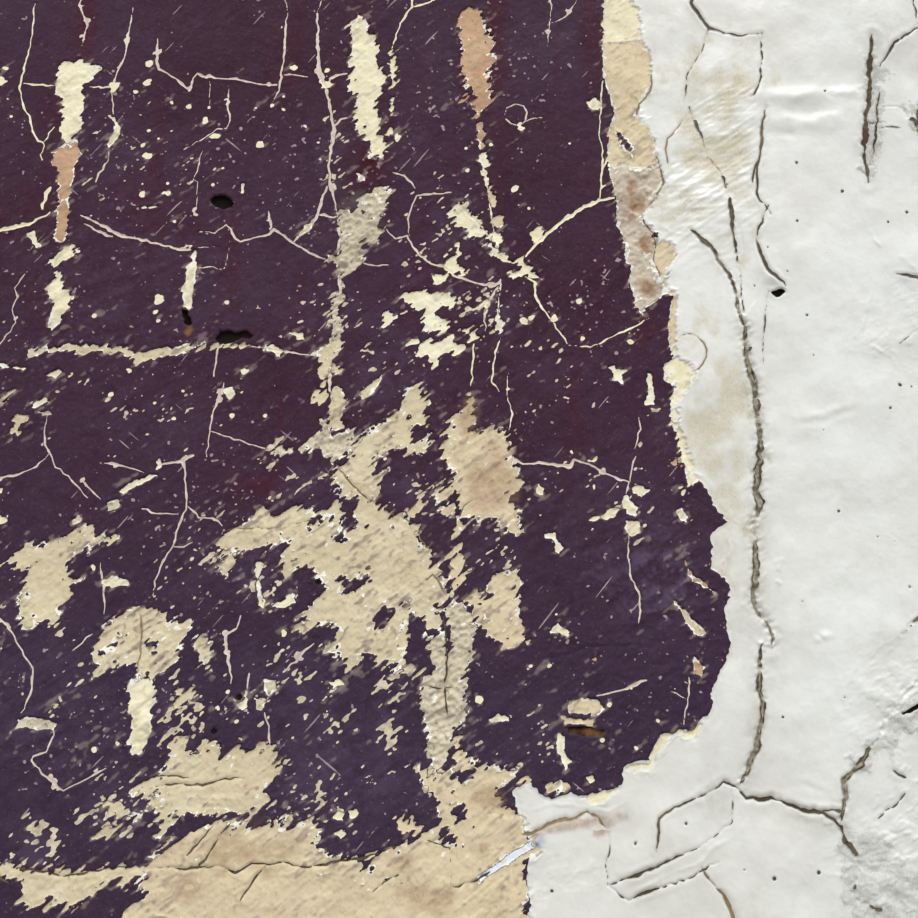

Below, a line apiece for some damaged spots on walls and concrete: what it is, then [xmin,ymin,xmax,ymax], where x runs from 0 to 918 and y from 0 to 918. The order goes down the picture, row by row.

peeling [34,59,100,330]
crack [80,1,348,336]
peeling [344,15,400,159]
crack [386,166,513,427]
peeling [456,7,498,168]
crack [525,81,649,348]
peeling [600,0,700,496]
crack [642,0,786,516]
crack [105,344,332,596]
peeling [0,156,604,918]
peeling [673,600,706,636]
crack [605,536,873,918]